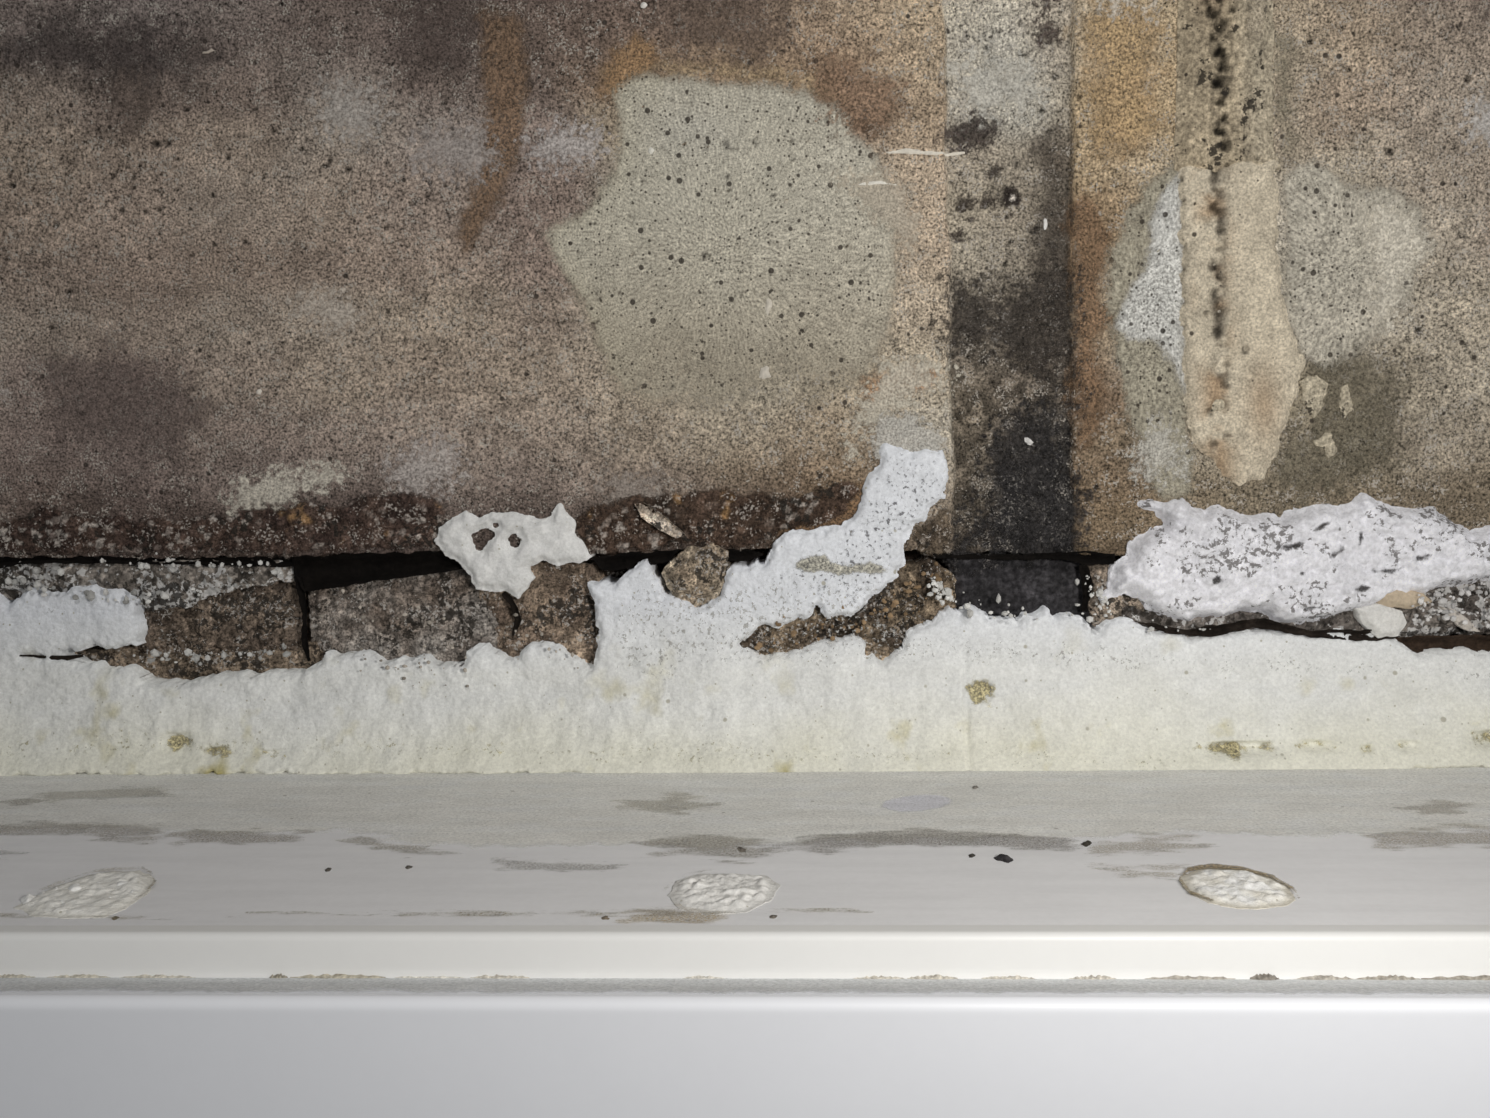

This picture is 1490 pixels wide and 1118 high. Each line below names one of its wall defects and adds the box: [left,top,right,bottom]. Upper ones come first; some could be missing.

rust [459,11,526,250]
damp [933,0,1062,243]
damp [1097,0,1158,25]
damp [401,75,1101,576]
rust [1062,198,1112,446]
spalling [0,492,444,556]
spalling [132,481,859,664]
spalling [914,509,953,555]